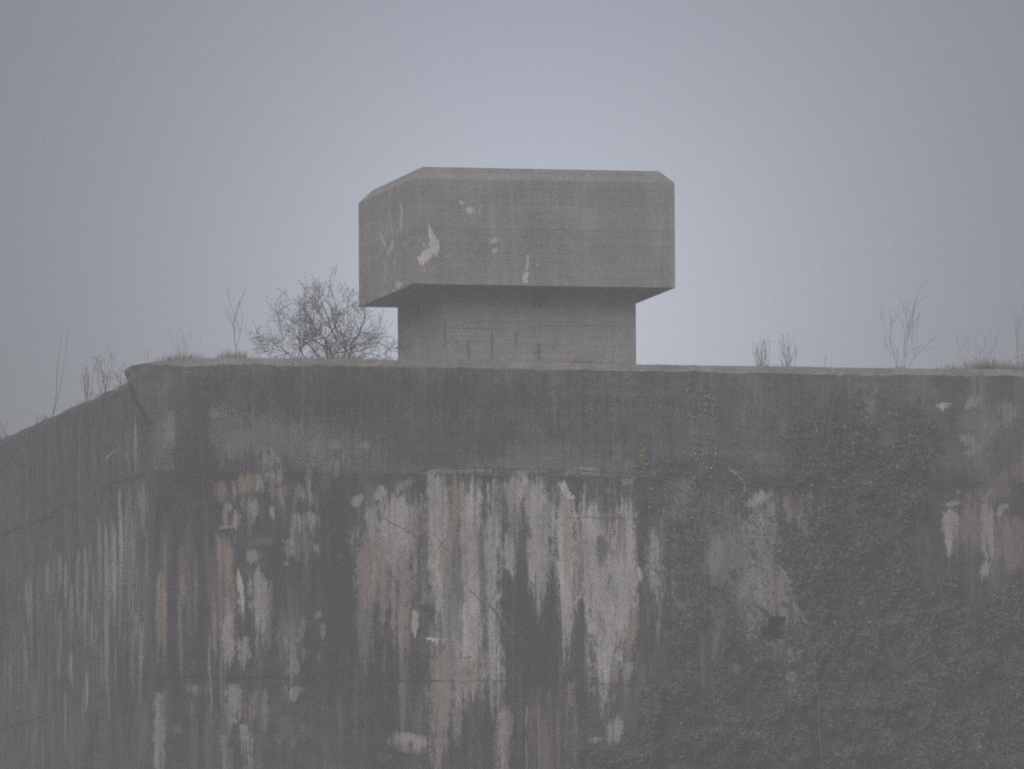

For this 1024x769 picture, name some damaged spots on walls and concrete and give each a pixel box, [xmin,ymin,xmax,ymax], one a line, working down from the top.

damp [237,568,245,612]
damp [351,472,659,769]